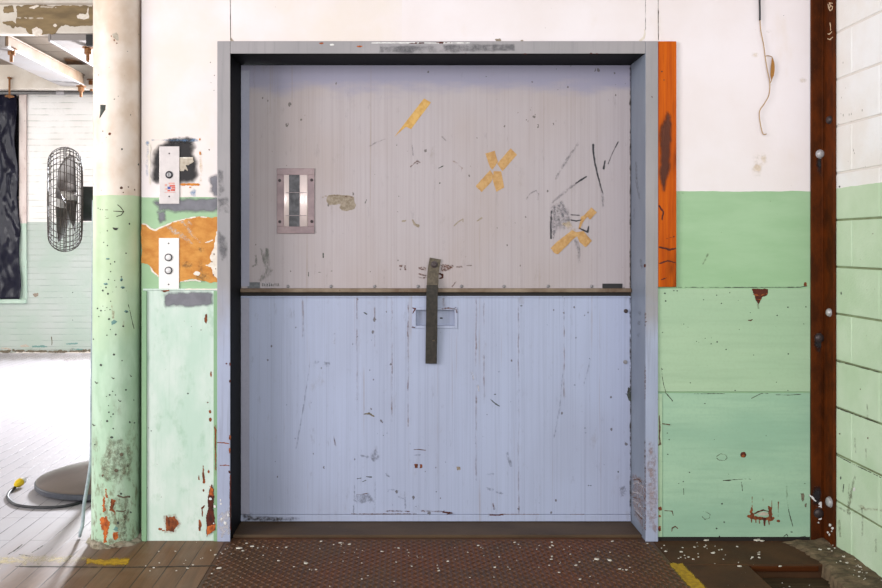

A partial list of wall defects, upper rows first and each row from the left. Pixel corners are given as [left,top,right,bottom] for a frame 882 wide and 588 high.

peeling [2,5,93,36]
peeling [141,216,217,290]
peeling [664,282,807,304]
rust [198,427,230,536]
rust [100,489,118,544]
rust [158,515,179,532]
rust [747,502,780,526]